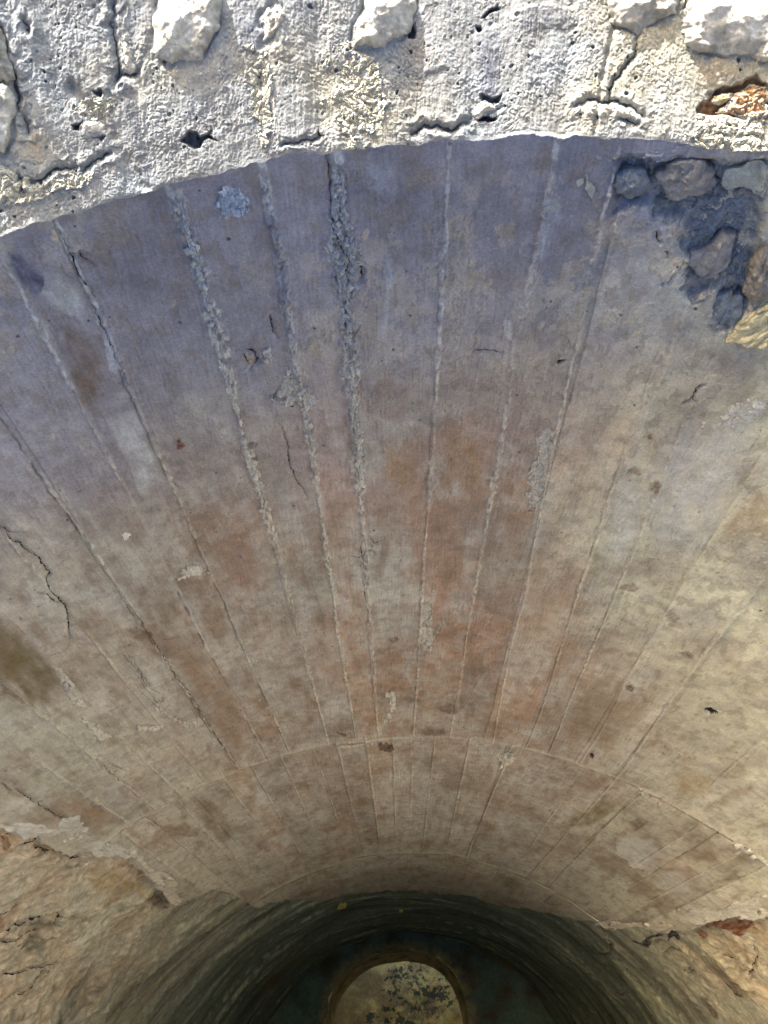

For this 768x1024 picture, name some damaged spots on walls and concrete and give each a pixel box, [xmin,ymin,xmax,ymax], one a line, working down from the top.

spalling [212,178,250,219]
crack [60,233,121,367]
crack [1,525,70,654]
damp [0,606,65,713]
spalling [382,690,396,723]
peeling [0,815,181,905]
crack [0,903,72,945]
rust [696,917,756,940]